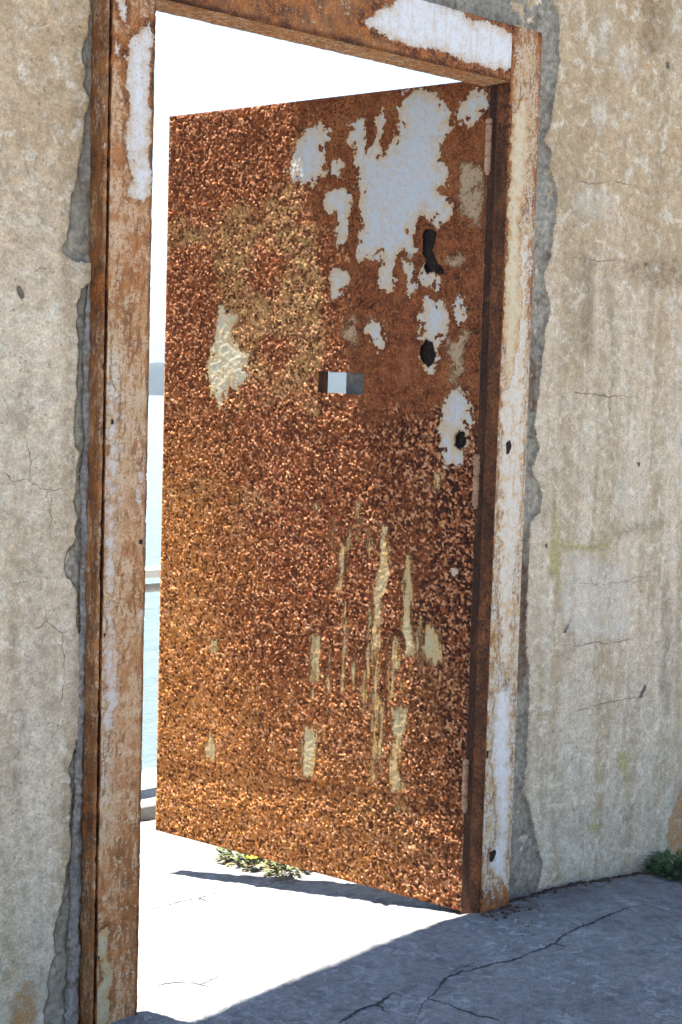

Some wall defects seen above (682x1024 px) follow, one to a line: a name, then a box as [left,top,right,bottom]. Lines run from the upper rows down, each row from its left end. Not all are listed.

flaking render [62,0,92,262]
peeling [283,87,489,470]
crack [4,447,62,539]
flaking render [365,0,561,900]
crack [574,392,630,410]
crack [35,602,68,711]
rust [517,549,528,691]
crack [563,638,648,712]